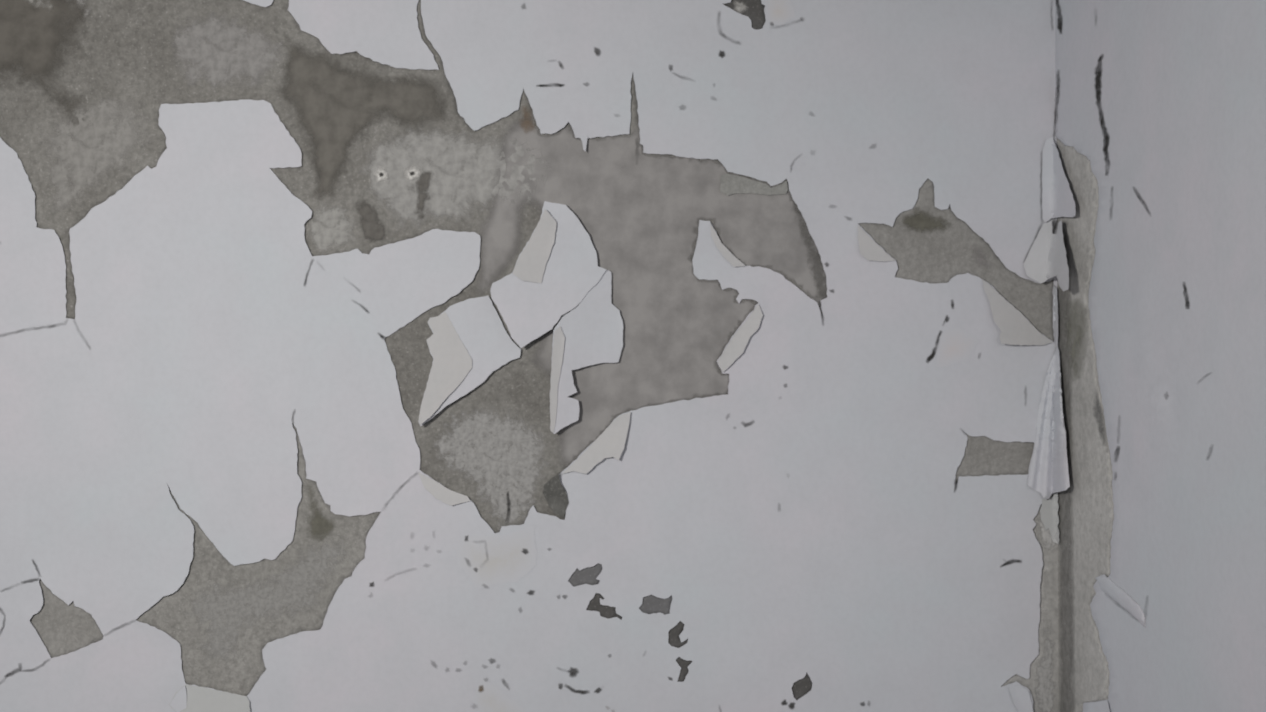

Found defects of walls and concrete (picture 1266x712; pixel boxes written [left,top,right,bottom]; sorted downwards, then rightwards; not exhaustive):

peeling [0,0,827,533]
peeling [858,138,1114,712]
peeling [30,579,103,658]
peeling [136,423,381,712]
peeling [568,563,622,619]
peeling [639,595,692,682]
peeling [782,673,812,709]